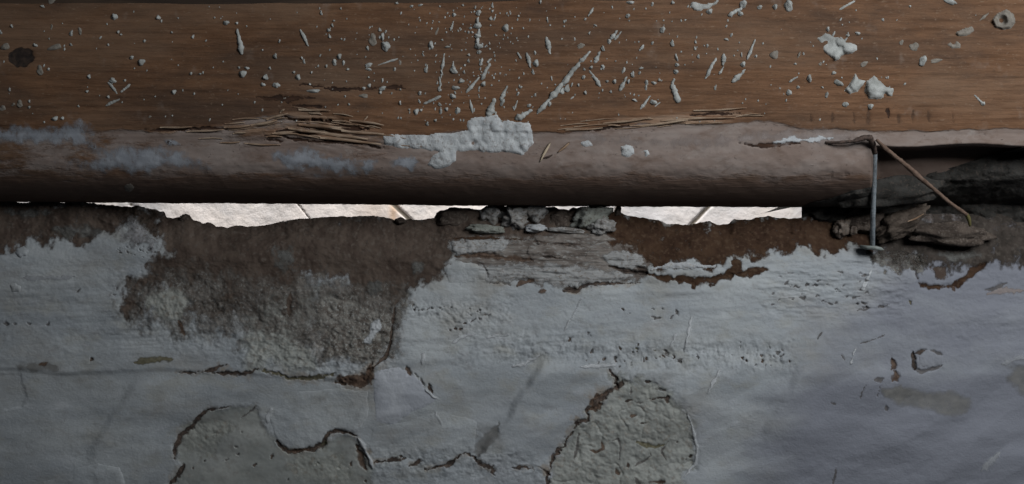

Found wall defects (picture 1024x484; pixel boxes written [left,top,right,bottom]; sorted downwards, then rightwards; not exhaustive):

flaking render [0,202,1024,374]
flaking render [172,407,371,484]
crack [179,363,373,388]
flaking render [550,343,694,484]
flaking render [874,358,900,396]